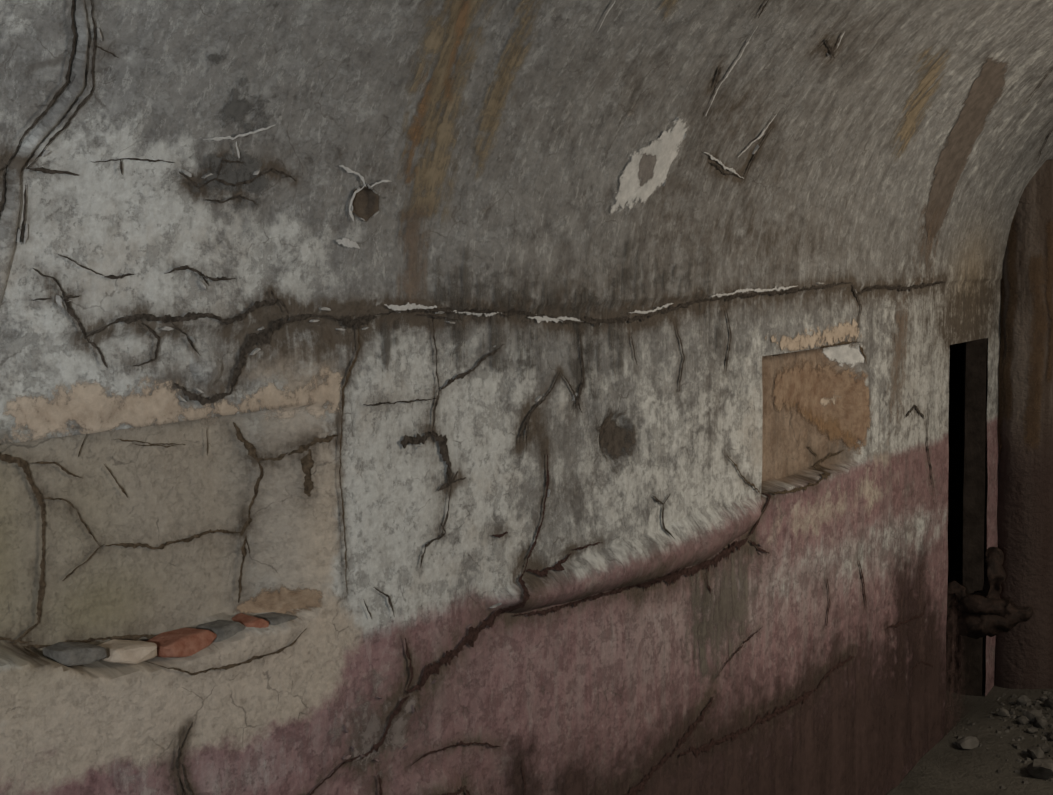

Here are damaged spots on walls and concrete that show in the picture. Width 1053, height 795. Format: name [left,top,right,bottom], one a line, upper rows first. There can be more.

crack [0,0,296,245]
water stain [219,78,281,131]
crack [336,165,391,249]
flaking render [351,183,380,222]
peeling [610,117,689,214]
crack [704,114,777,180]
flaking render [0,367,343,443]
crack [0,253,945,657]
crack [80,628,307,675]
flaking render [233,586,322,614]
crack [309,447,855,795]
water stain [558,550,964,795]